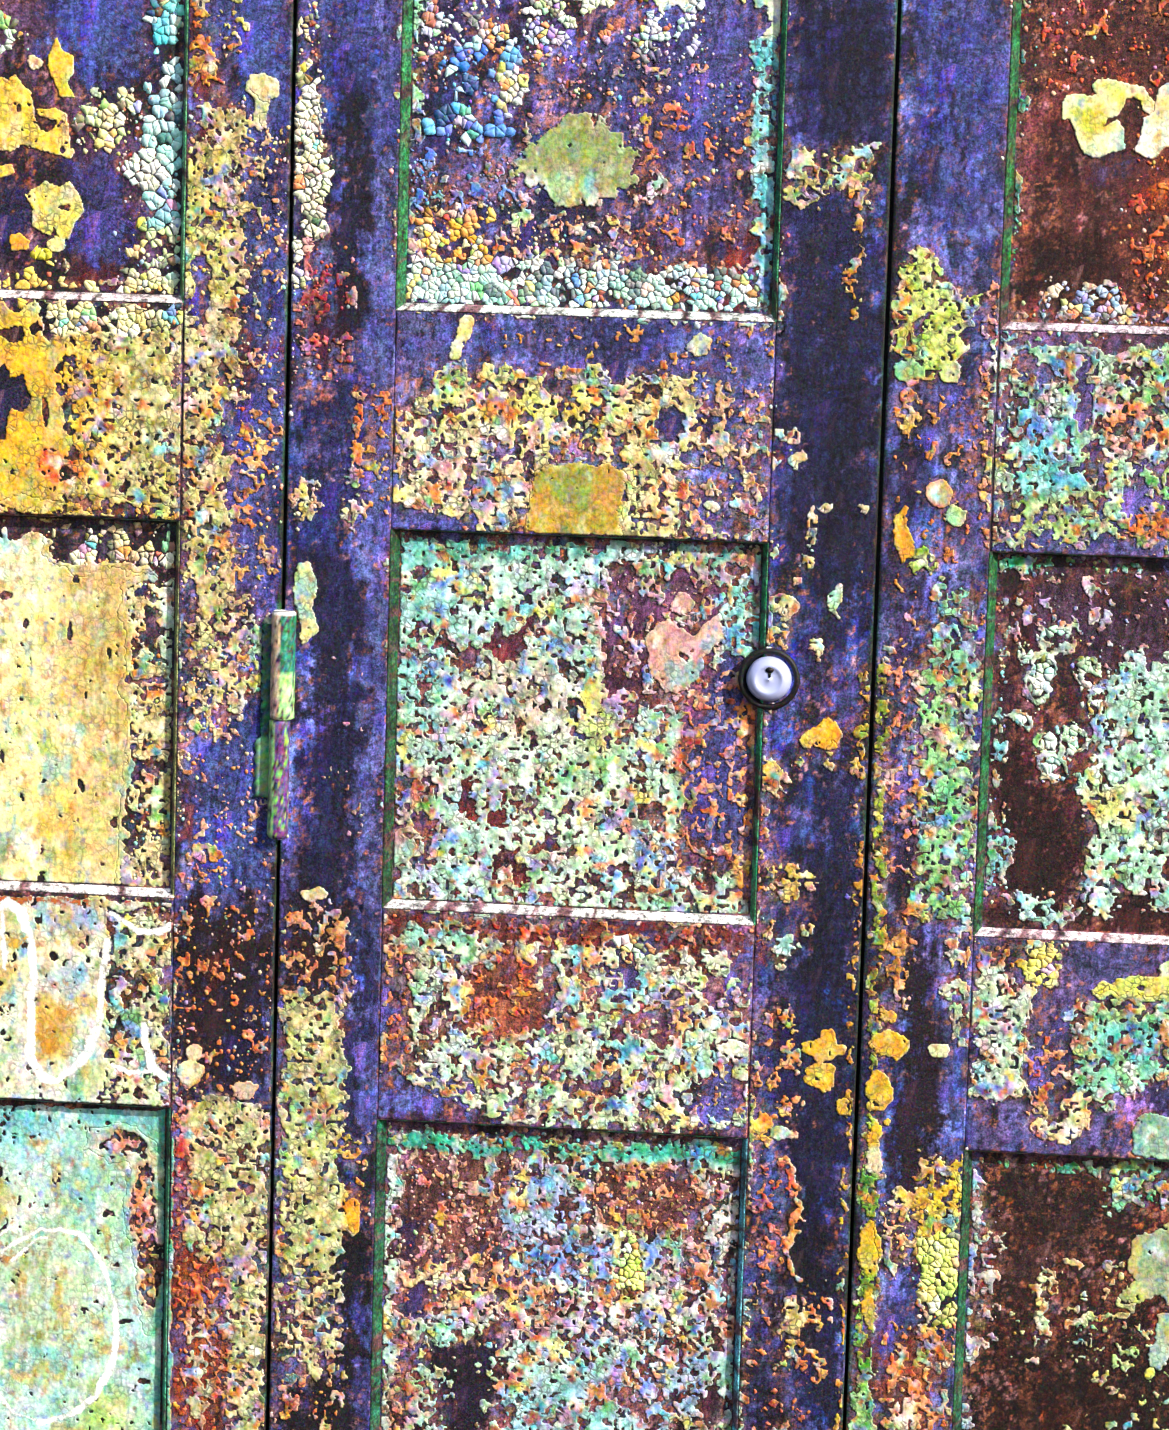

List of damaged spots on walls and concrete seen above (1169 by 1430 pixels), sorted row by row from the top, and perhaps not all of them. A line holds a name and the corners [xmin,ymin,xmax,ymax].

peeling [783,142,882,320]
rust [1017,0,1169,322]
peeling [889,0,1169,930]
peeling [0,0,854,1430]
rust [445,759,546,904]
rust [467,616,547,669]
rust [386,913,766,1048]
rust [601,656,654,709]
peeling [832,496,1169,1430]
rust [167,1091,230,1430]
rust [868,1288,950,1430]
rust [972,1160,1169,1430]